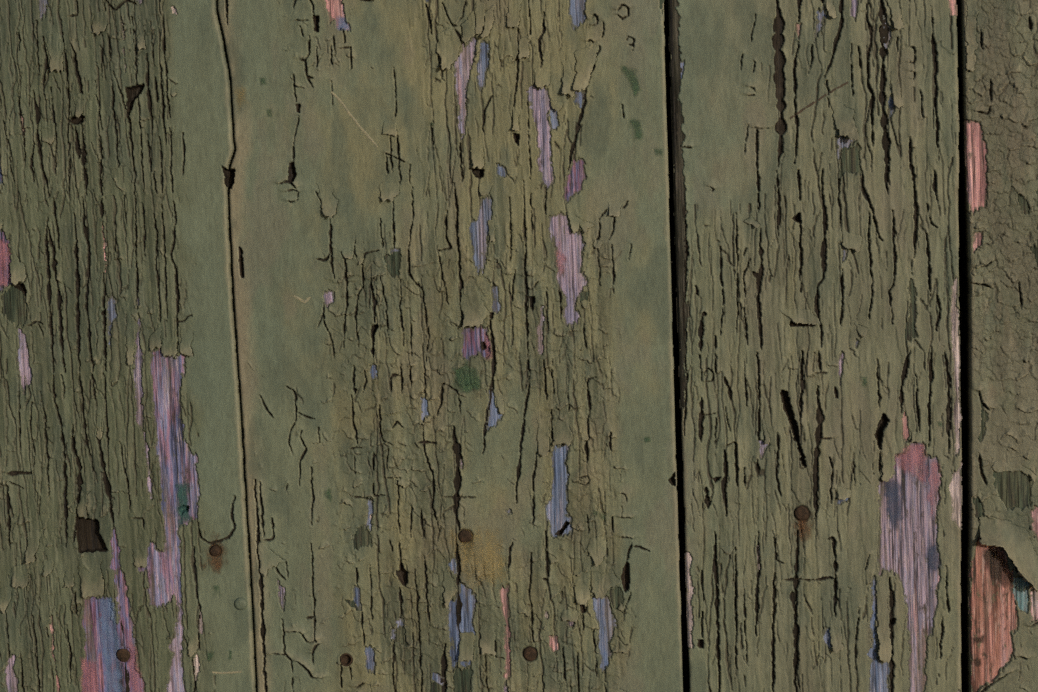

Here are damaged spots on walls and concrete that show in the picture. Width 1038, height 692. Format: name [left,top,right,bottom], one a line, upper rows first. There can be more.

crack [293,0,352,158]
peeling [436,0,603,328]
crack [569,23,635,164]
peeling [948,0,979,72]
peeling [0,215,33,395]
peeling [77,290,203,692]
crack [192,479,316,692]
crack [261,388,320,511]
crack [317,72,496,692]
peeling [430,558,511,692]
crack [482,1,611,641]
peeling [867,278,1038,692]